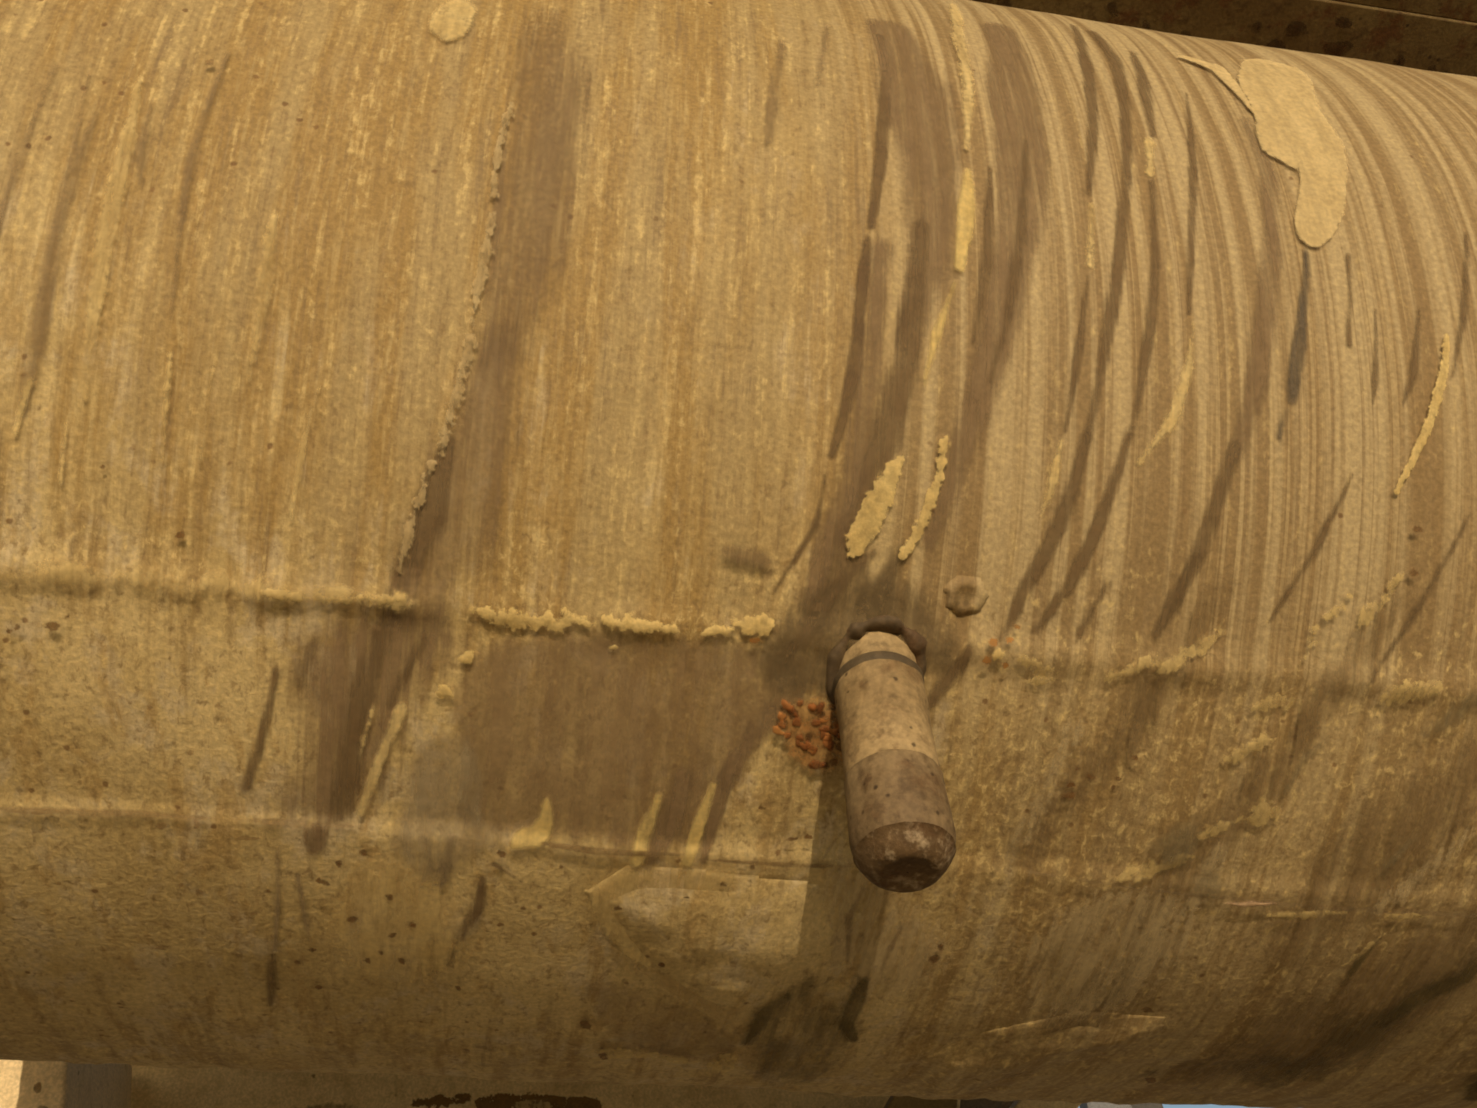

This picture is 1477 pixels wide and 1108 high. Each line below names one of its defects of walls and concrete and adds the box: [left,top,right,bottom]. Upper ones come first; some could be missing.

rust [1253,21,1305,49]
rust [1325,18,1353,56]
water stain [1000,25,1159,638]
water stain [1153,58,1353,675]
water stain [401,4,1046,891]
peeling [845,455,905,558]
peeling [898,435,951,560]
water stain [1035,345,1193,631]
water stain [302,302,505,853]
peeling [470,605,681,650]
peeling [701,612,775,638]
rust [773,697,843,772]